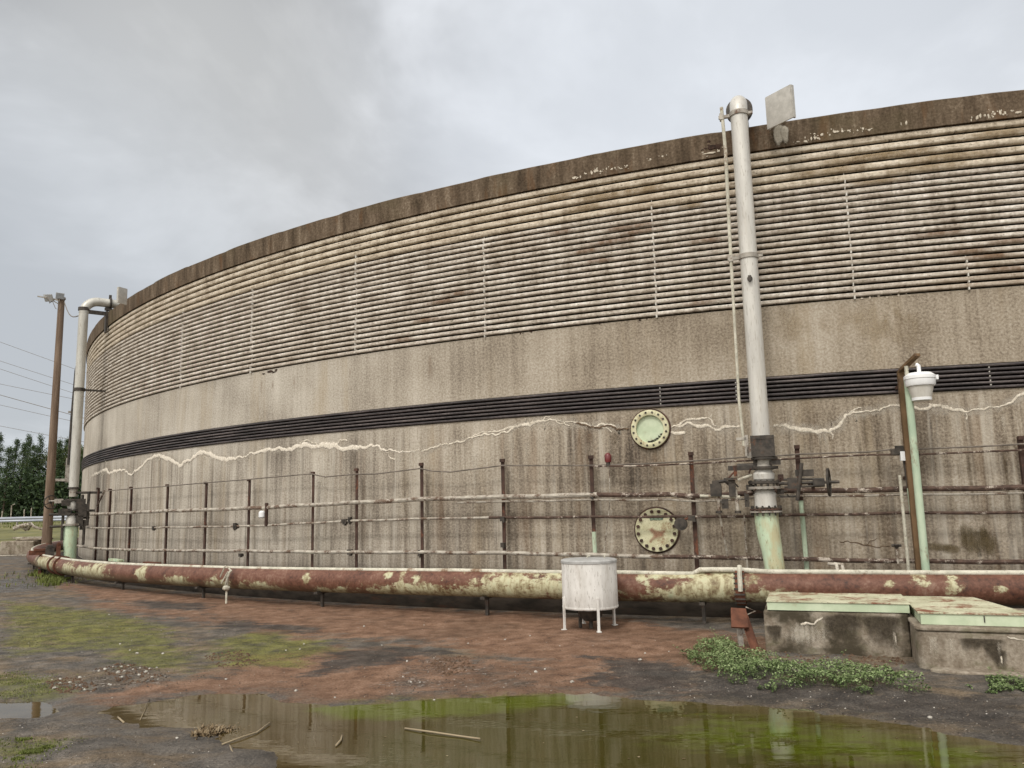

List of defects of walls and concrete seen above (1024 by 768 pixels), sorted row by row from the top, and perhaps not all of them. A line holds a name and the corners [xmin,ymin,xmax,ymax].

crack [90,416,629,478]
crack [671,414,740,435]
crack [774,392,1024,439]